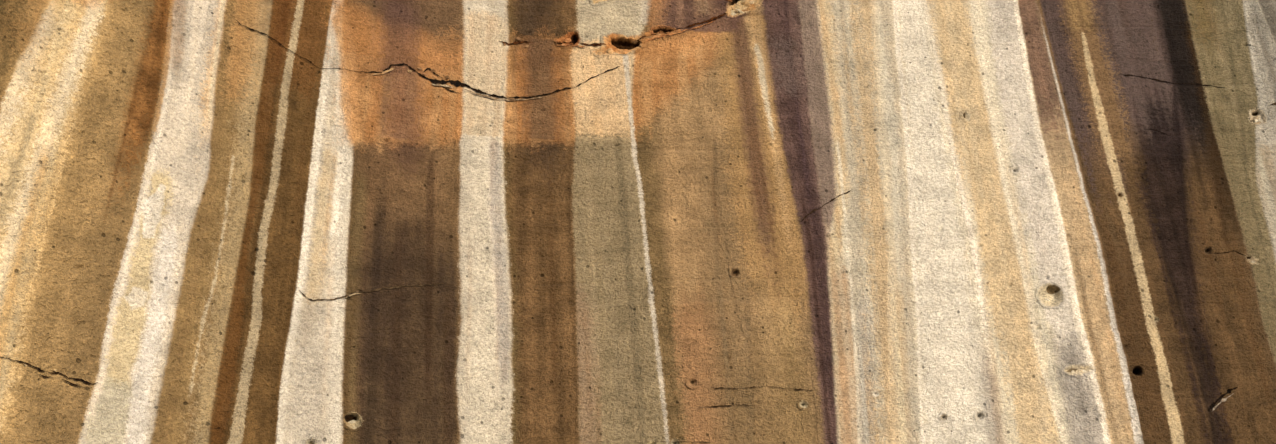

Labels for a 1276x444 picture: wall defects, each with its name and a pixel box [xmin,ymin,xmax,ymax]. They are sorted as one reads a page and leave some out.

damp [0,6,114,439]
damp [76,0,800,444]
crack [234,0,765,101]
spalling [554,23,678,58]
damp [567,0,1276,444]